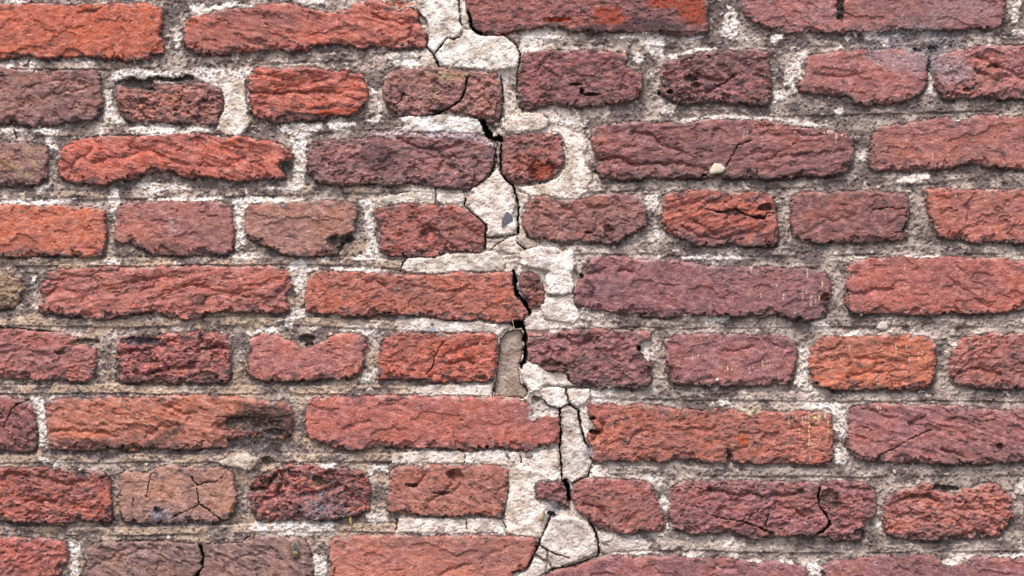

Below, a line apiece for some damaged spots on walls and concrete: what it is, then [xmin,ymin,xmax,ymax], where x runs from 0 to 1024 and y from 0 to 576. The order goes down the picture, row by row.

crack [417,0,600,576]
crack [878,429,932,459]
crack [116,476,251,576]
crack [706,509,775,535]
crack [815,487,832,536]